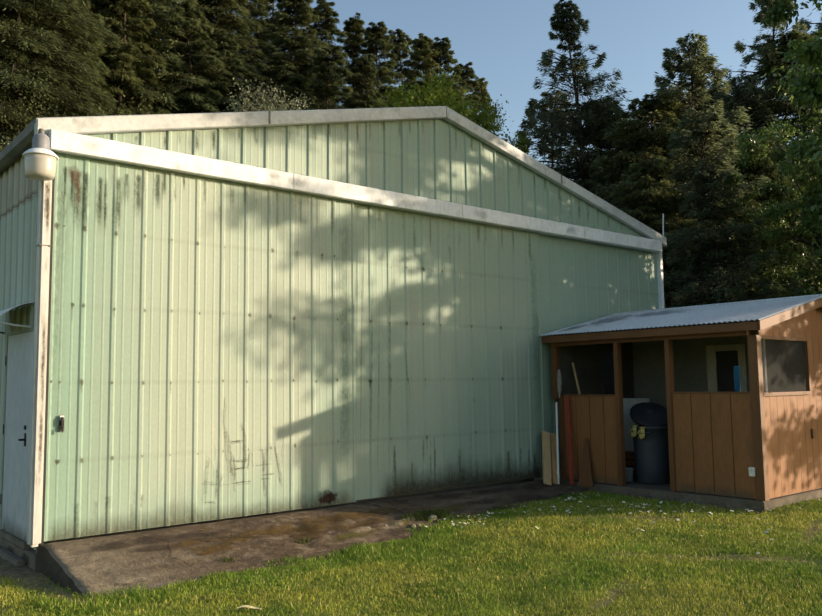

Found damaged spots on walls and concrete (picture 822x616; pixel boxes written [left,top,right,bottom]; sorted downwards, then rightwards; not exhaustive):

damp [99,172,120,219]
damp [386,469,548,504]